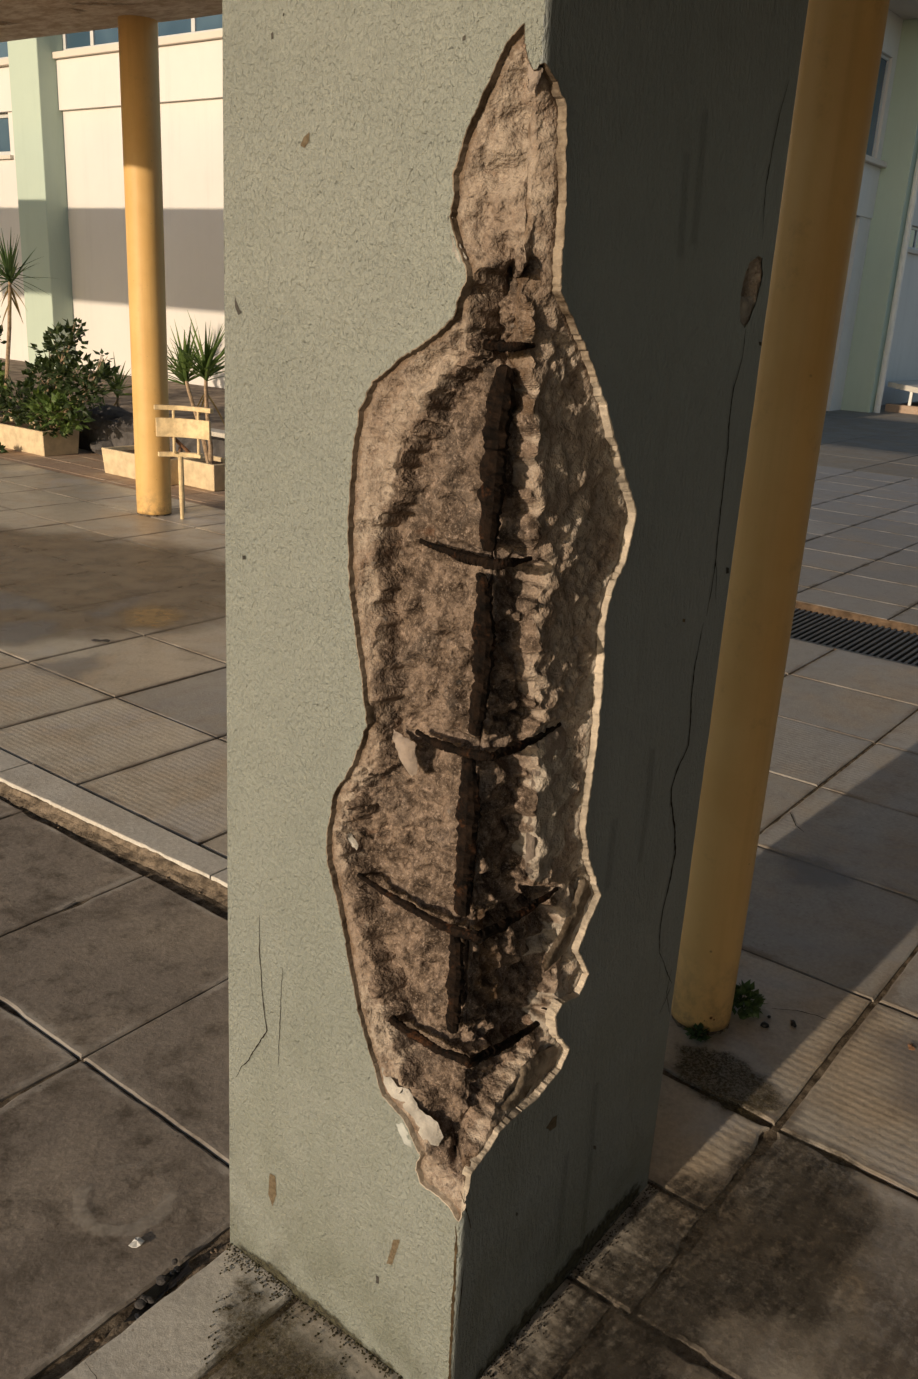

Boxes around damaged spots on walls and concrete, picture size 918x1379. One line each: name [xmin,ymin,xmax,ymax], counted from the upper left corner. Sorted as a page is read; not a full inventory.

spalling [326,23,637,1222]
crack [659,330,746,1012]
water stain [238,1246,403,1378]
water stain [476,1133,876,1379]